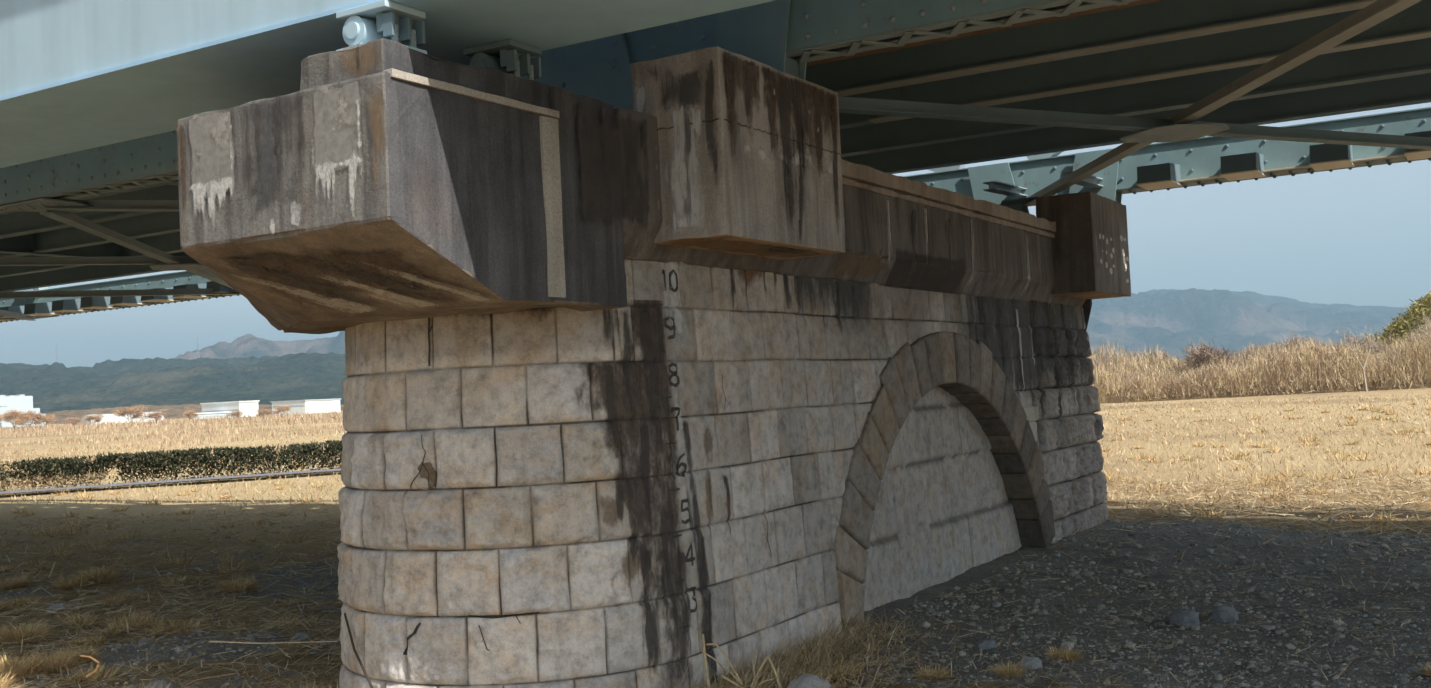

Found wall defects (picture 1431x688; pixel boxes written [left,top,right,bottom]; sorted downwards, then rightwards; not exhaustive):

damp [243,95,304,234]
damp [578,52,839,240]
damp [783,275,868,330]
damp [885,199,1093,424]
crack [410,435,429,489]
damp [577,300,718,688]
crack [403,622,421,655]